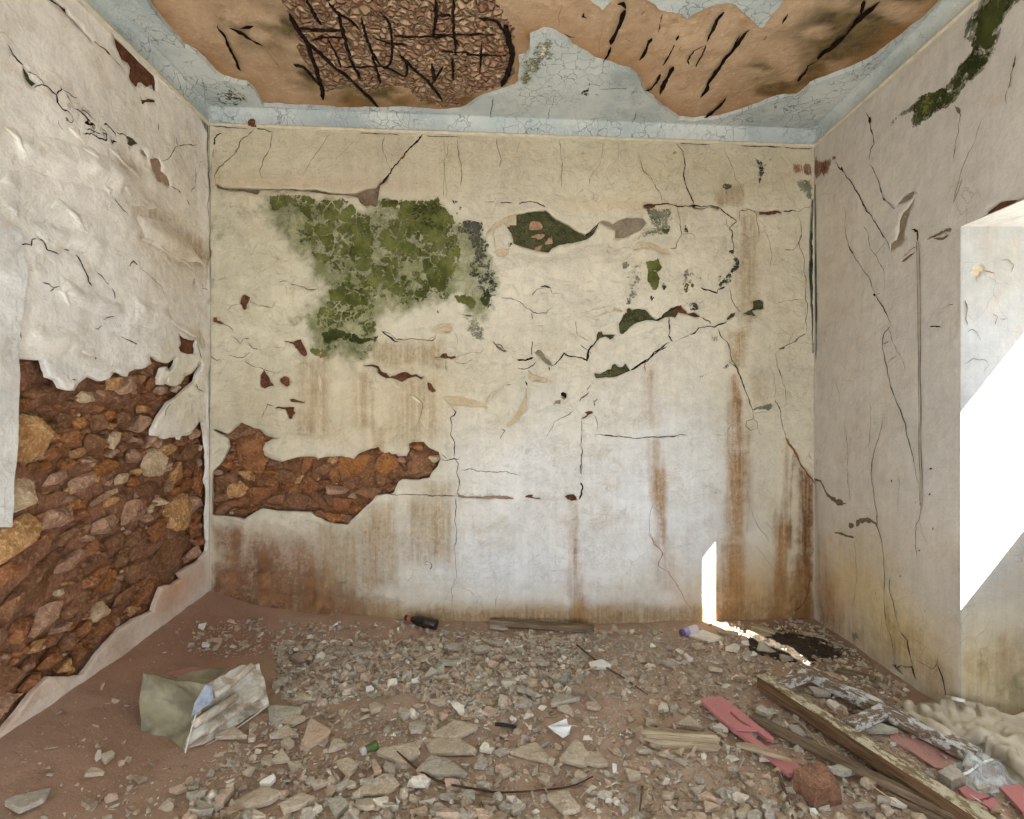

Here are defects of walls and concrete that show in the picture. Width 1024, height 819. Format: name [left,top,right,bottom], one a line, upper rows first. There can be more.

crack [8,45,126,144]
crack [216,16,292,74]
spalling [150,0,938,117]
crack [558,2,788,121]
mould [443,200,497,301]
flaking render [486,204,670,257]
flaking render [173,320,196,354]
flaking render [285,339,307,356]
mould [465,315,484,340]
crack [382,285,592,386]
crack [589,113,952,695]
rust [775,472,811,620]